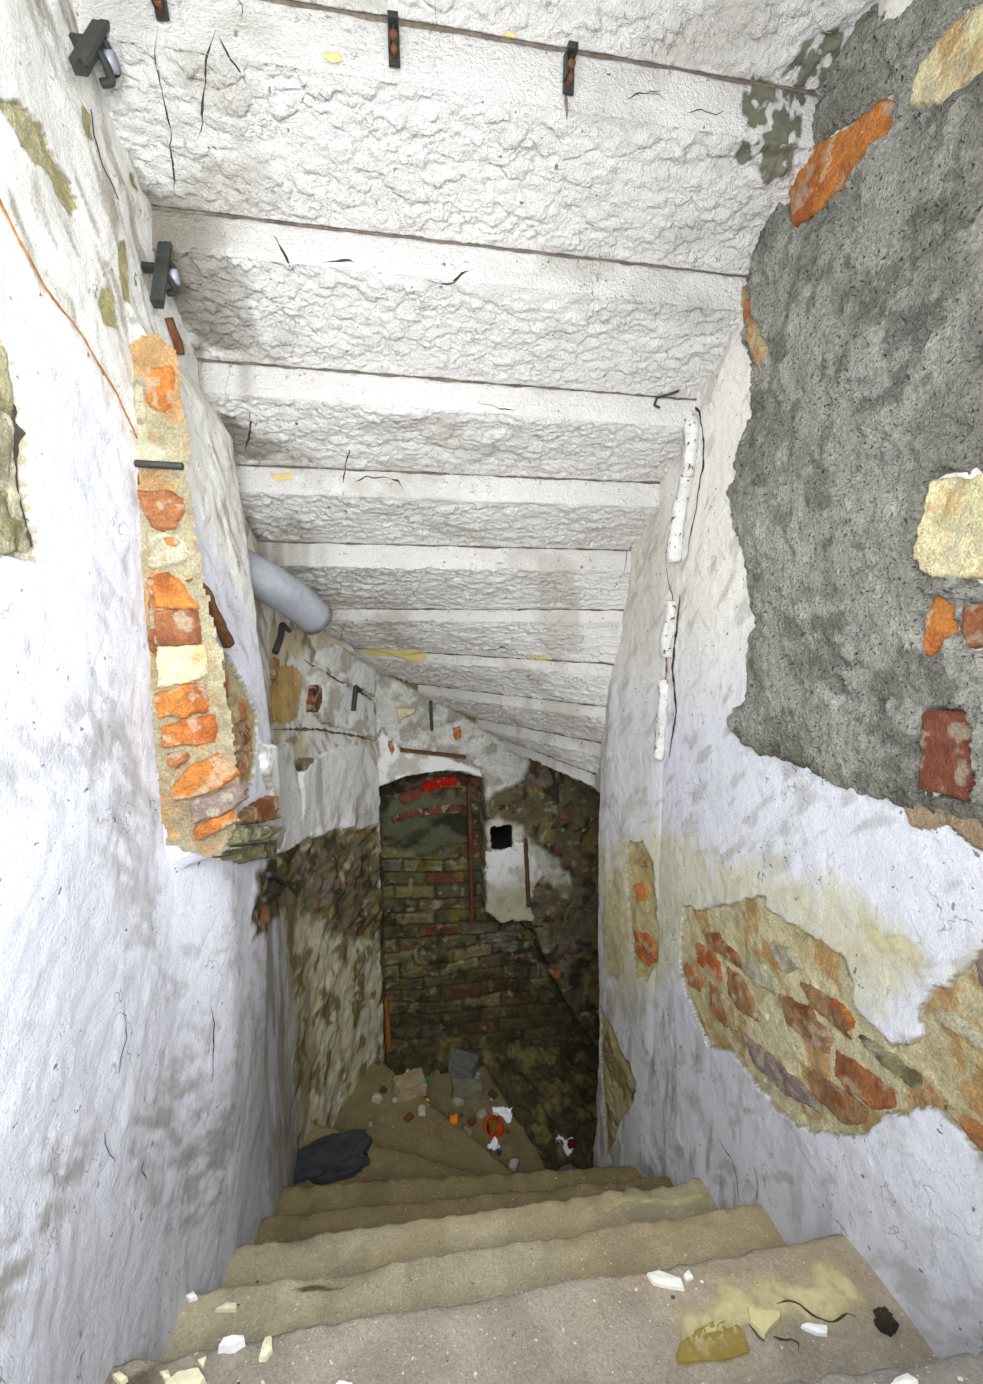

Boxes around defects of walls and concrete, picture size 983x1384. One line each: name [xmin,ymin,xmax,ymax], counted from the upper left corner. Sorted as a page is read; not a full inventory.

crack [154,0,246,197]
flaking render [788,3,983,228]
peeling [98,239,130,330]
flaking render [741,285,768,372]
spalling [0,344,33,559]
flaking render [912,473,983,580]
spalling [130,333,482,864]
flaking render [923,595,983,657]
flaking render [918,709,976,801]
spalling [628,842,659,980]
spalling [682,897,983,1152]